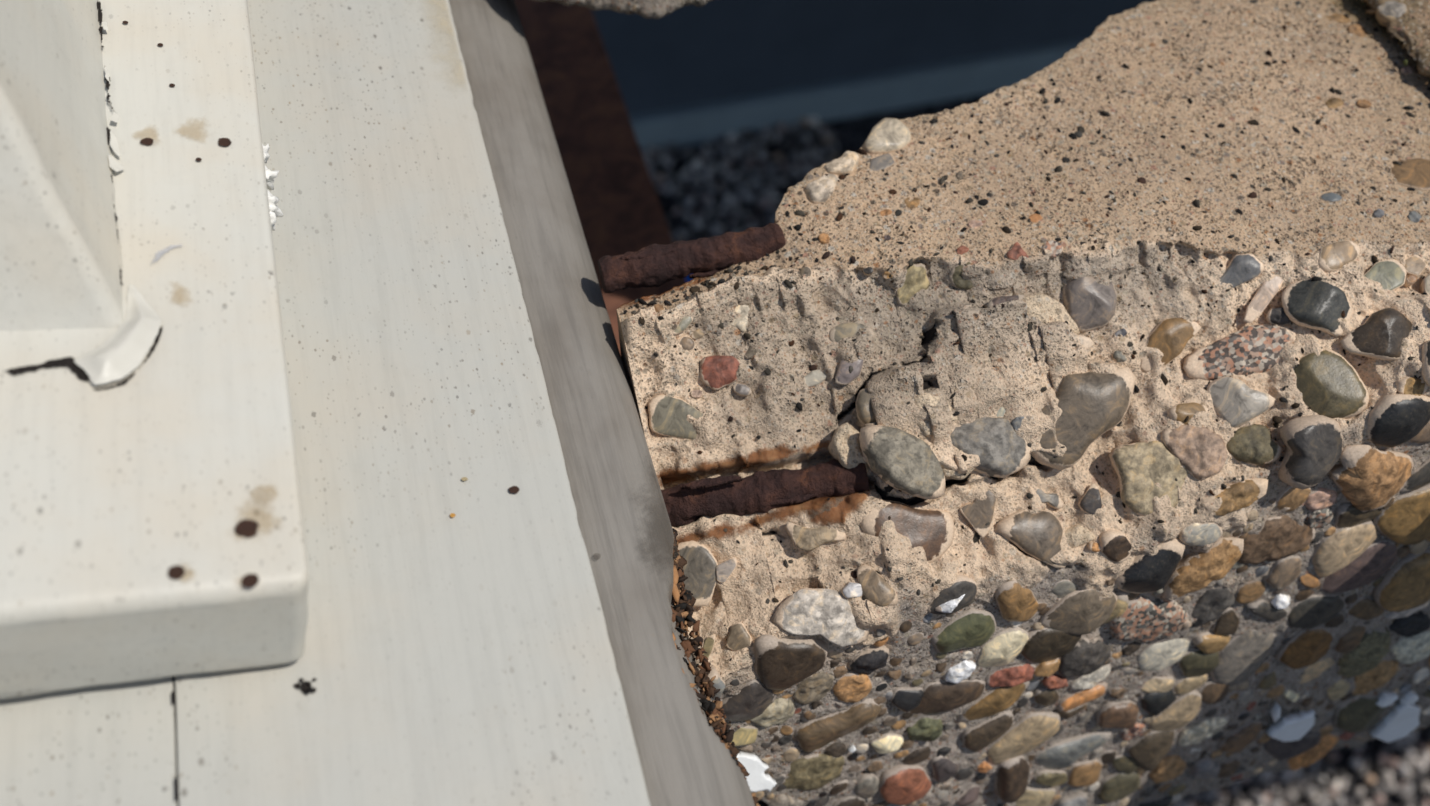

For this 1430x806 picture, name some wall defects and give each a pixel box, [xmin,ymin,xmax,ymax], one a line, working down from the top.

peeling [74,284,163,390]
rust [659,441,830,486]
spalling [621,240,1430,638]
rust [676,481,875,543]
crack [172,777,180,801]
peeling [737,749,777,793]